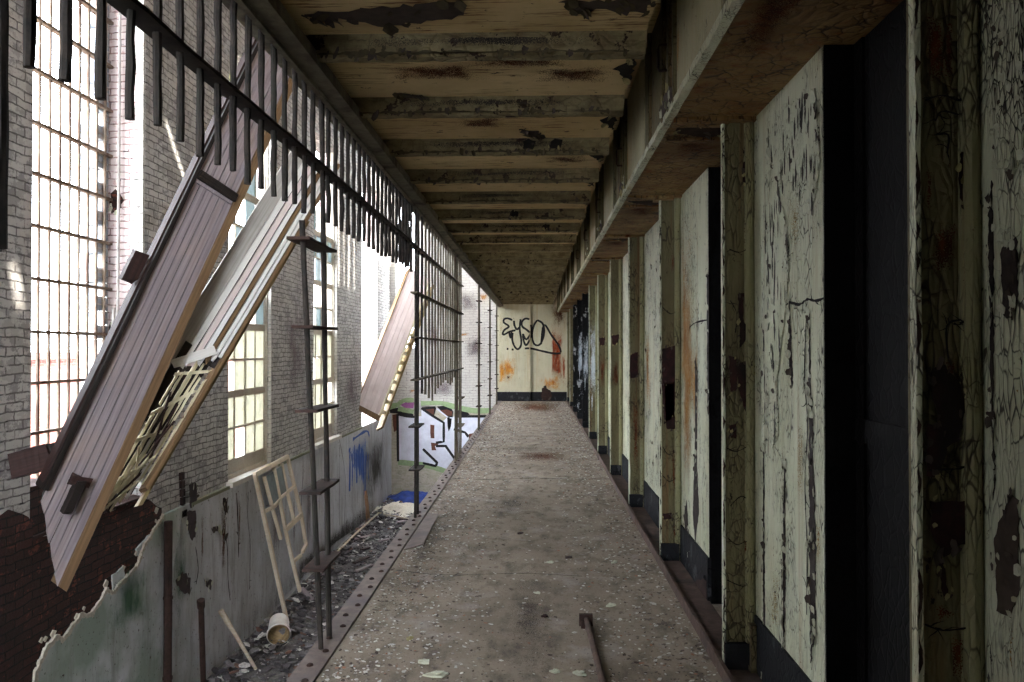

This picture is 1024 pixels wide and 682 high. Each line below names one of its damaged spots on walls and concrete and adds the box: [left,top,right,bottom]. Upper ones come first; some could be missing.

peeling [301,0,637,85]
corrosion [388,60,611,83]
peeling [559,0,656,20]
corrosion [499,359,515,384]
corrosion [539,325,566,389]
peeling [630,255,709,550]
corrosion [671,215,698,501]
peeling [723,88,821,663]
crack [786,296,824,615]
crack [935,313,983,359]
peeling [981,0,1024,629]
flaking render [0,499,164,682]